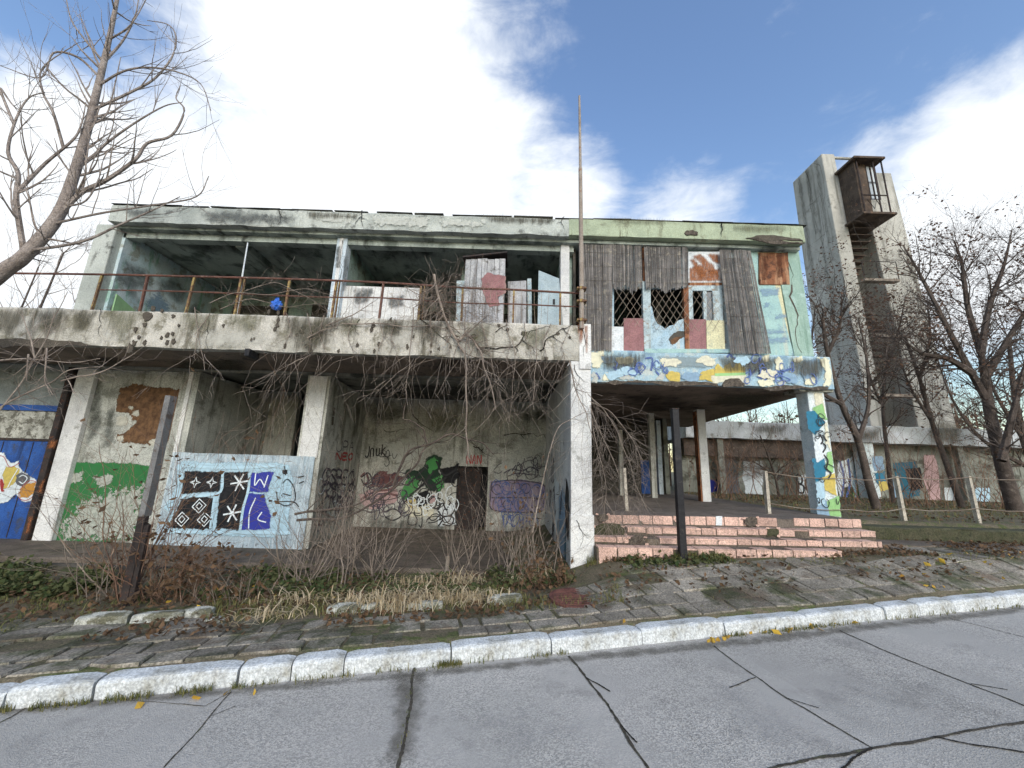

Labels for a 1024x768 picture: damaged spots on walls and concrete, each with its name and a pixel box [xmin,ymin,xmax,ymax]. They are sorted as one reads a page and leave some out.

damp [206,211,289,224]
crack [787,163,864,353]
spalling [126,281,181,353]
flaking render [116,383,180,446]